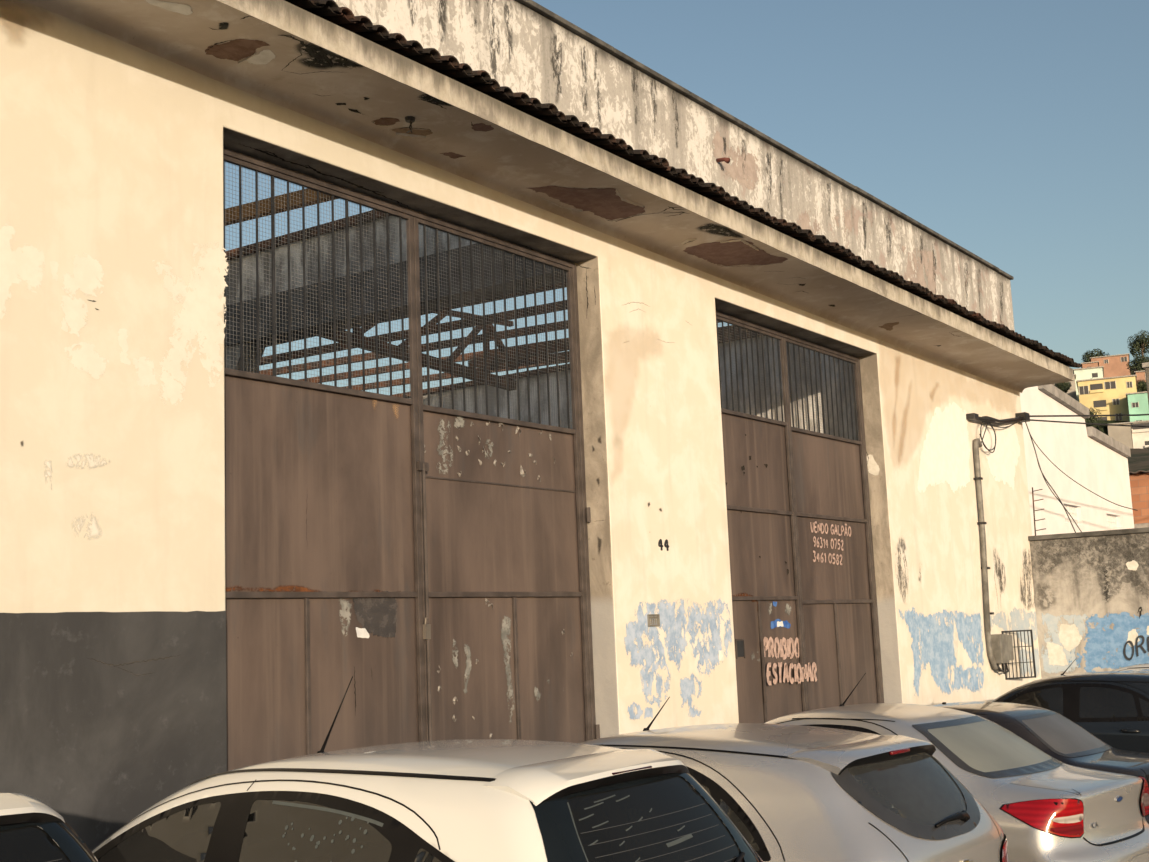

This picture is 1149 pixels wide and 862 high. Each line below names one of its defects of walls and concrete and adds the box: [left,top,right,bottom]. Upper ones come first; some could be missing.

flaking render [205,39,275,65]
water stain [282,36,363,74]
water stain [419,94,451,109]
water stain [474,0,512,78]
water stain [551,36,562,102]
water stain [581,47,601,122]
flaking render [528,186,645,221]
water stain [698,223,742,238]
flaking render [682,239,788,266]
peeling [0,223,229,405]
peeling [624,599,732,720]
peeling [899,607,1149,696]